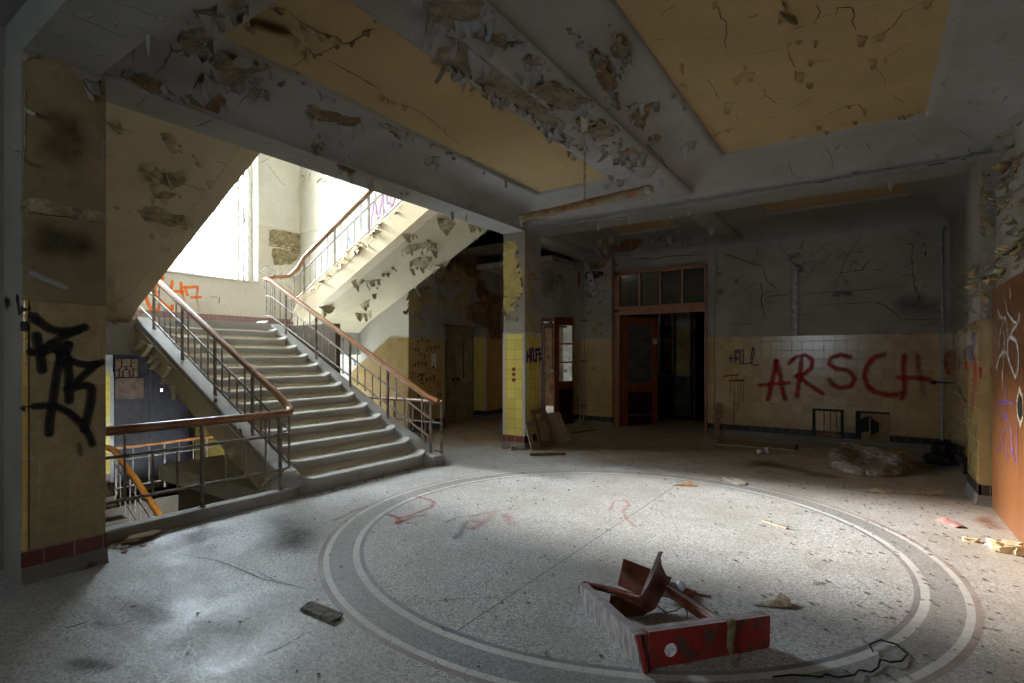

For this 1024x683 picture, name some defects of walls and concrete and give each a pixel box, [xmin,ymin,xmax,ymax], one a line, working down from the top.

peeling [120,0,376,114]
crack [287,10,465,149]
peeling [435,23,662,189]
crack [703,5,917,102]
peeling [113,133,227,252]
spalling [292,189,410,322]
peeling [351,205,541,339]
crack [631,228,947,335]
peeling [964,113,1024,302]